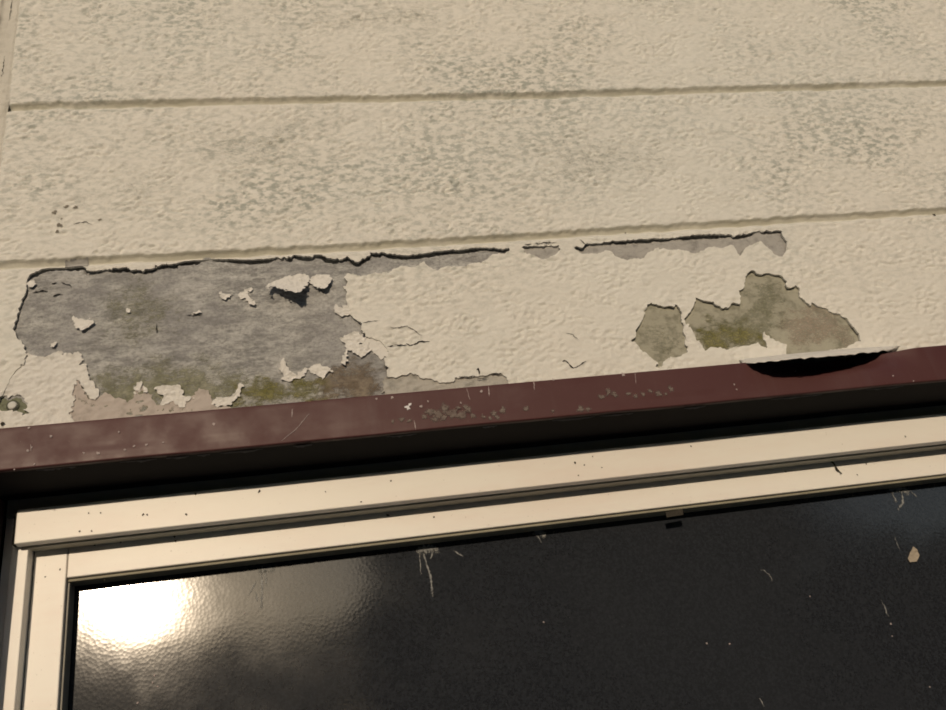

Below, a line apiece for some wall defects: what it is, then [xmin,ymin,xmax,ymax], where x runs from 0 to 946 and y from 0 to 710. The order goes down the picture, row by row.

peeling [523,246,559,259]
peeling [575,231,786,260]
peeling [0,249,509,428]
peeling [632,271,859,368]